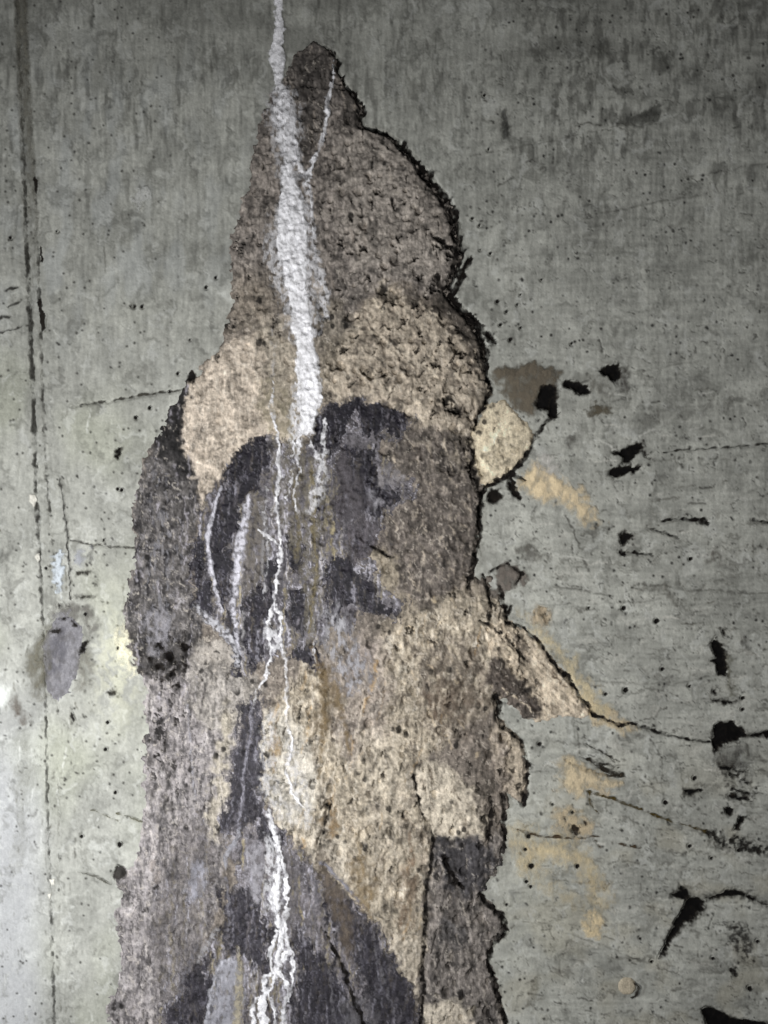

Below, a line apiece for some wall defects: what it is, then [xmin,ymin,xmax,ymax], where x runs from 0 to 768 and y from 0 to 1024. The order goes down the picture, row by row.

spalling [501,110,509,138]
crack [328,49,711,743]
peeling [469,360,611,504]
water stain [144,0,423,1024]
peeling [490,562,528,600]
hole [148,643,189,689]
peeling [485,614,591,722]
peeling [490,717,529,802]
hole [113,866,126,880]